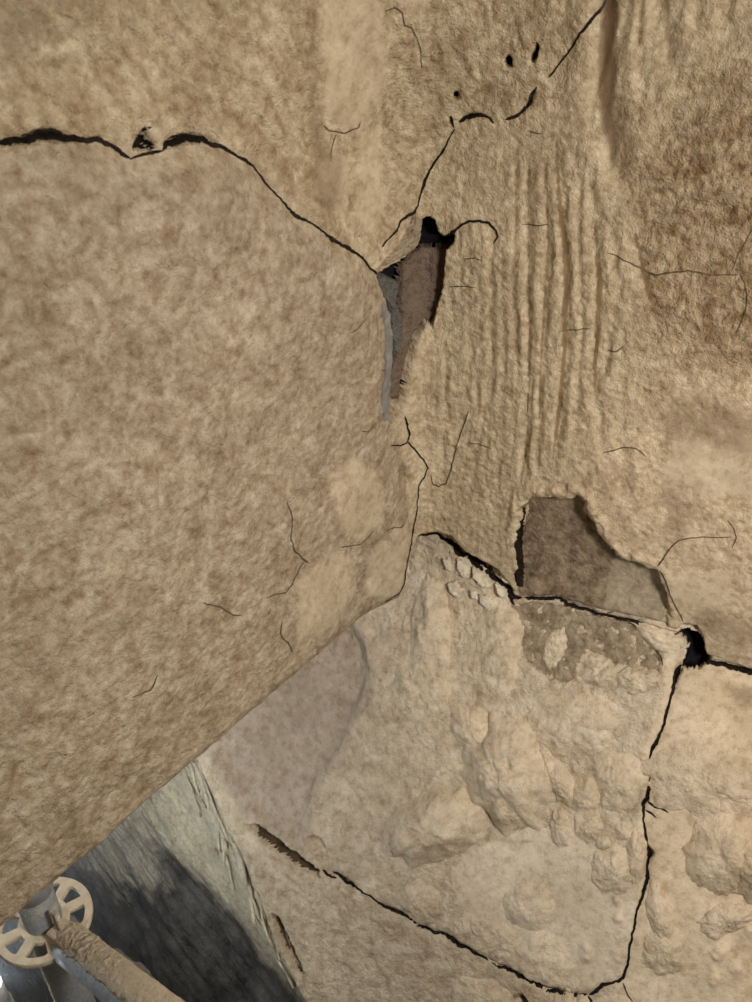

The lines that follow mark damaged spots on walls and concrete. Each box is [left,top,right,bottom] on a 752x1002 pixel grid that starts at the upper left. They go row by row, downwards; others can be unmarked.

crack [0,0,646,627]
spalling [442,495,668,682]
crack [657,520,737,635]
crack [705,655,752,675]
crack [322,650,681,1002]